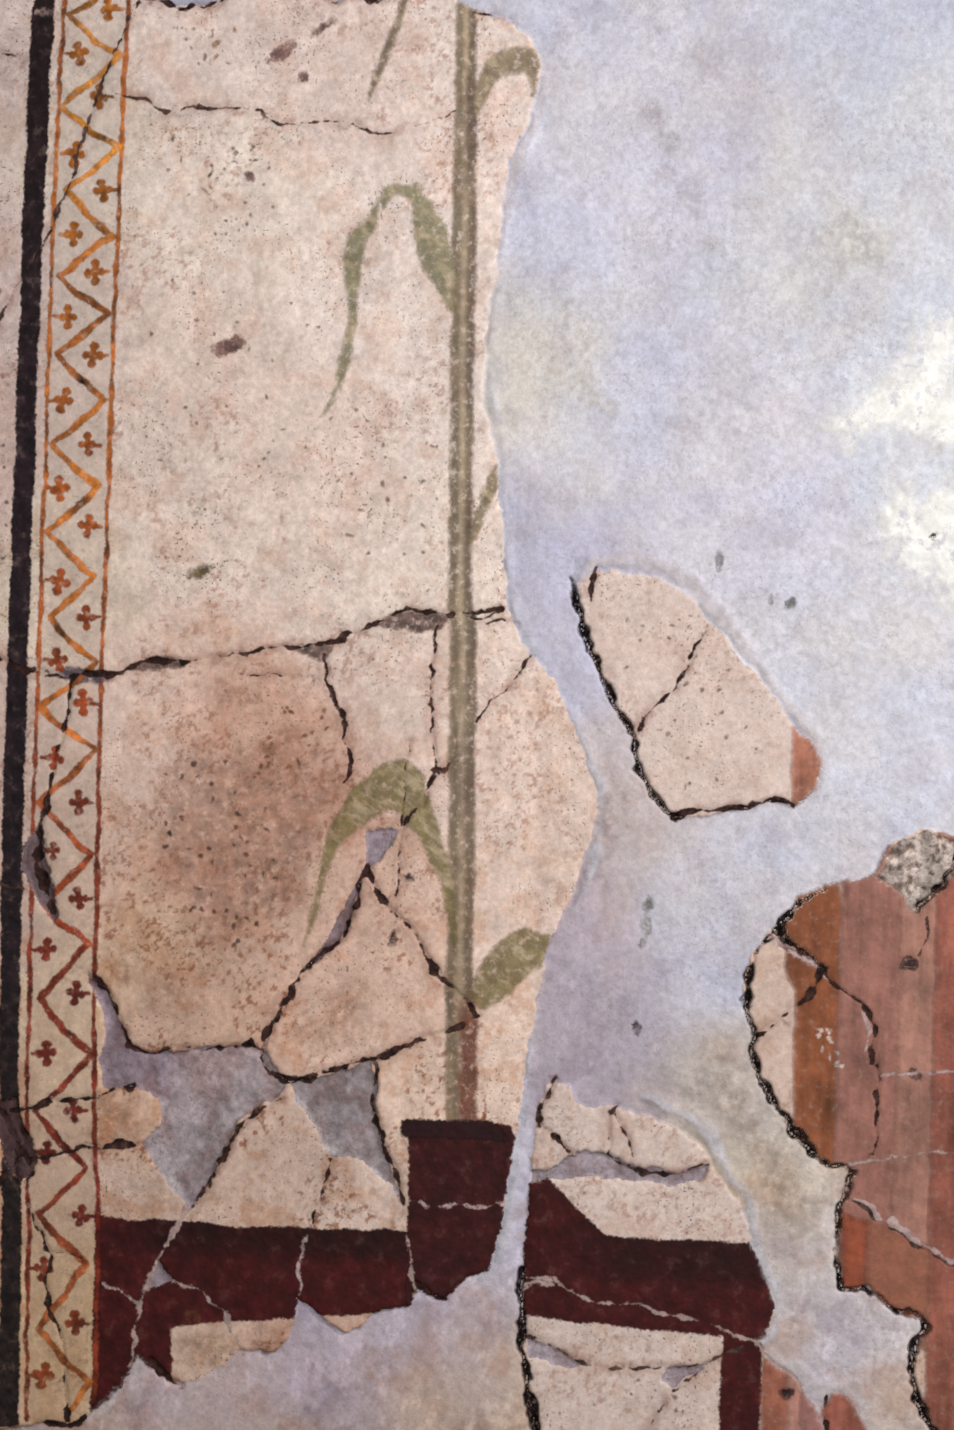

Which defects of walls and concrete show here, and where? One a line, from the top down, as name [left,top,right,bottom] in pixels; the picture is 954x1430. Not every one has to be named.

crack [0,0,456,321]
spalling [769,597,796,608]
crack [670,796,795,821]
crack [0,605,506,1208]
spalling [875,830,954,912]
spalling [88,977,399,1210]
crack [536,1076,571,1153]
crack [756,963,881,1155]
spalling [531,1150,708,1187]
spalling [526,1337,581,1369]
crack [43,1374,87,1428]
spalling [655,1361,710,1426]